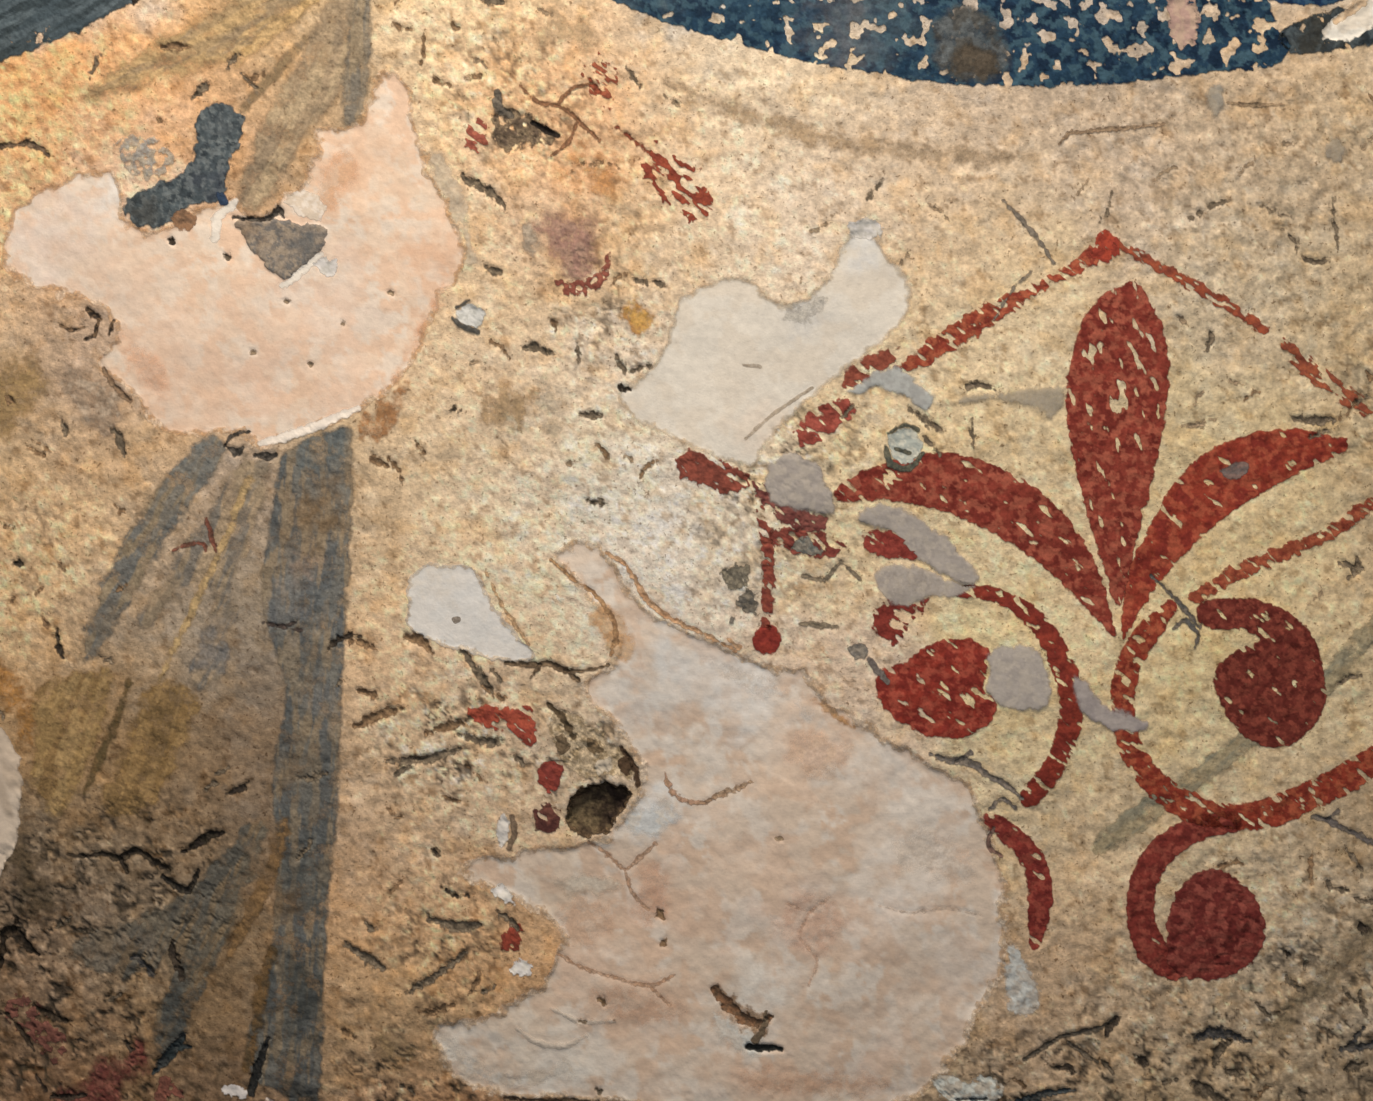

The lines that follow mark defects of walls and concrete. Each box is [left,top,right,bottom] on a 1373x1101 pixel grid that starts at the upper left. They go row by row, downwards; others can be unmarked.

flaking render [3,71,560,449]
flaking render [595,213,917,560]
spalling [110,427,127,458]
crack [66,830,225,894]
flaking render [385,538,1039,1101]
crack [0,917,40,968]
crack [5,1002,88,1101]
flaking render [221,1084,247,1099]